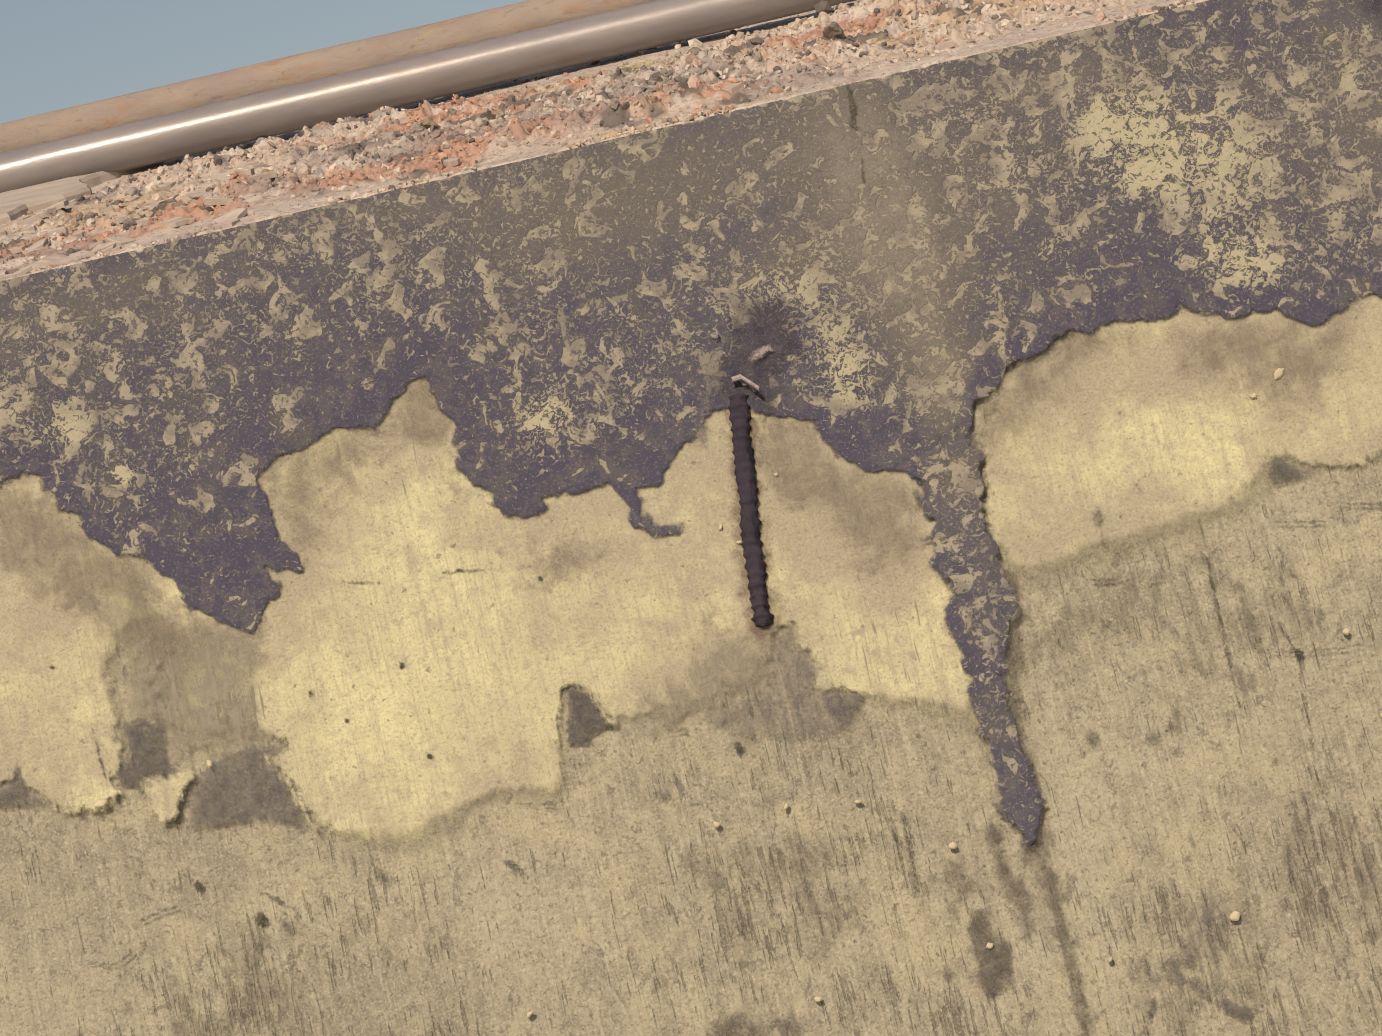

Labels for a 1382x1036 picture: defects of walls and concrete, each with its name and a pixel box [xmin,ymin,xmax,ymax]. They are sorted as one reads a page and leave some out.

water stain [0,494,259,752]
peeling [0,301,980,844]
water stain [760,424,1090,1036]
peeling [967,292,1382,577]